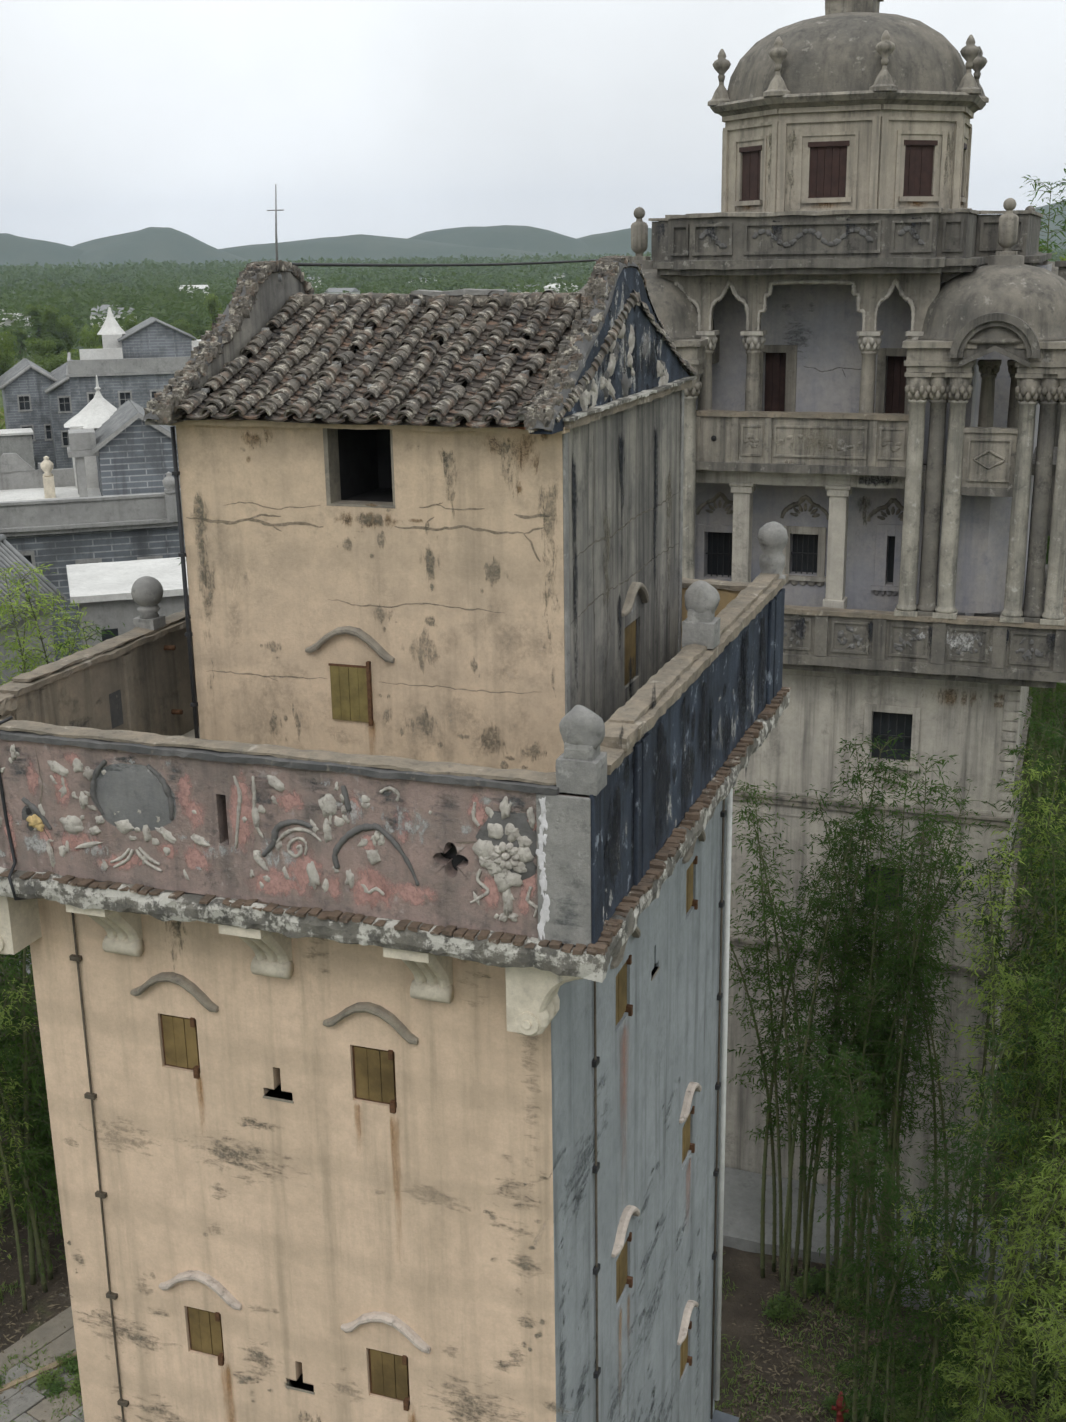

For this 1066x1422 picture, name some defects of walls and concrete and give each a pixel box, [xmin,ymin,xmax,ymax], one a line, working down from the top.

water stain [194,495,215,614]
crack [187,502,323,531]
peeling [0,751,436,907]
flaking render [473,797,550,940]
water stain [214,1138,281,1179]